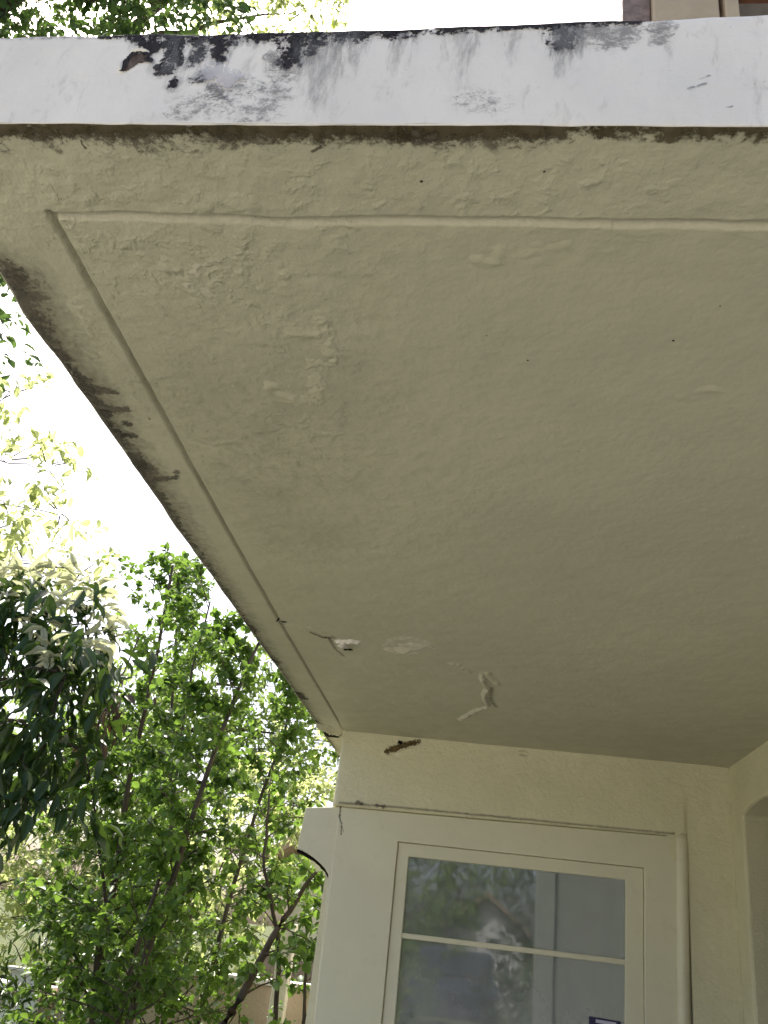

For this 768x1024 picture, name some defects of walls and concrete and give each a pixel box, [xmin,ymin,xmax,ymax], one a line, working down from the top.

peeling [118,48,154,73]
leakage [98,21,645,90]
leakage [65,364,138,438]
leakage [128,452,179,482]
spalling [334,639,361,651]